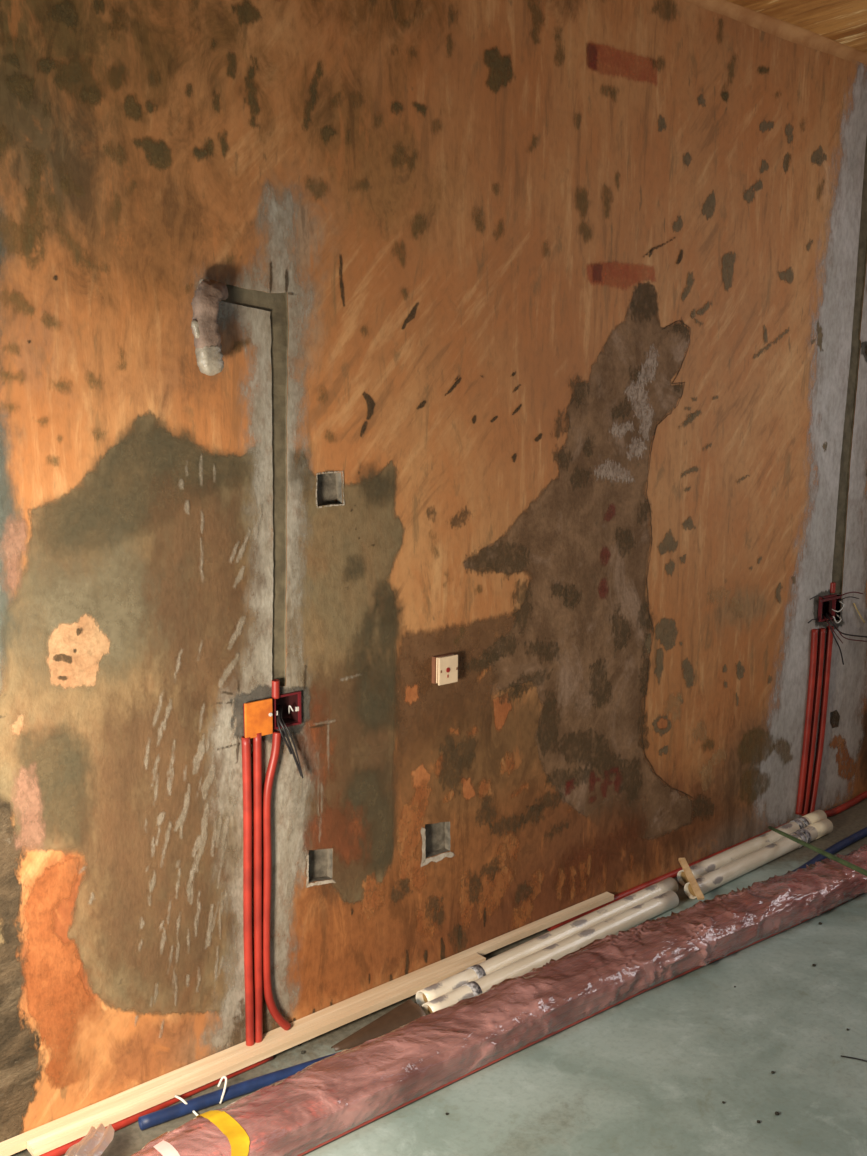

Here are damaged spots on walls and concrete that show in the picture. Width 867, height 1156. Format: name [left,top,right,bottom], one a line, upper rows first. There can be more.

leakage [232,0,260,25]
leakage [3,37,153,121]
leakage [227,53,260,127]
leakage [106,138,172,169]
leakage [193,132,228,159]
leakage [577,189,591,240]
leakage [230,506,261,587]
leakage [219,619,243,687]
flaking render [0,412,264,1142]
leakage [739,730,791,804]
leakage [145,696,234,978]
leakage [424,937,445,963]